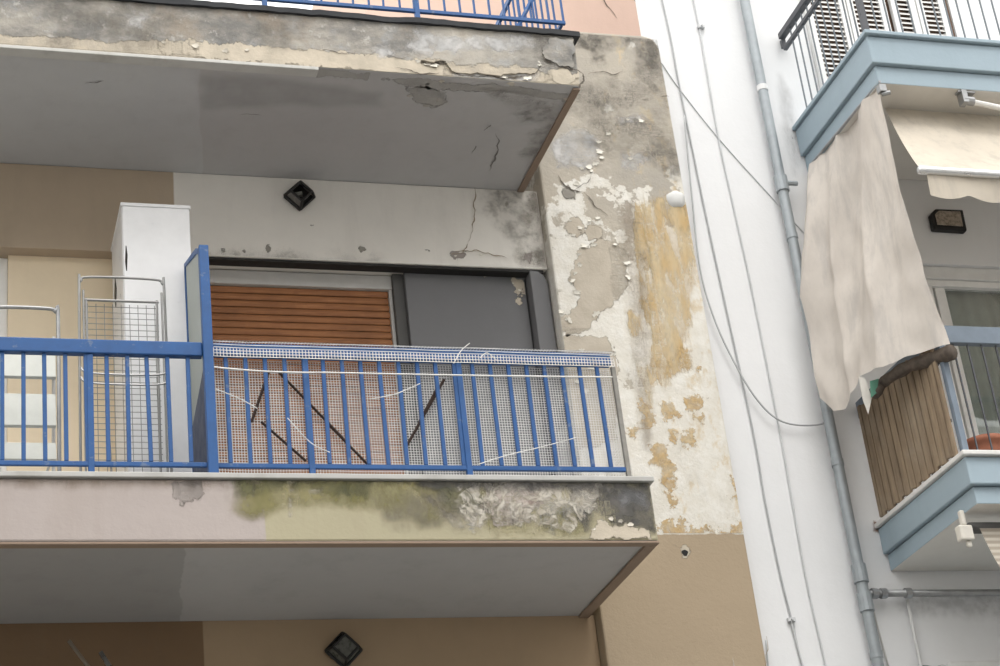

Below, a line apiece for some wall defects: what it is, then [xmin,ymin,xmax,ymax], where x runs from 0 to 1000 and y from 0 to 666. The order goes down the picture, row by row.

spalling [158,32,580,108]
crack [389,37,620,89]
leakage [640,41,658,67]
crack [472,125,500,171]
peeling [553,130,611,200]
crack [451,191,506,258]
peeling [476,216,744,558]
leakage [236,480,298,514]
leakage [418,481,656,532]